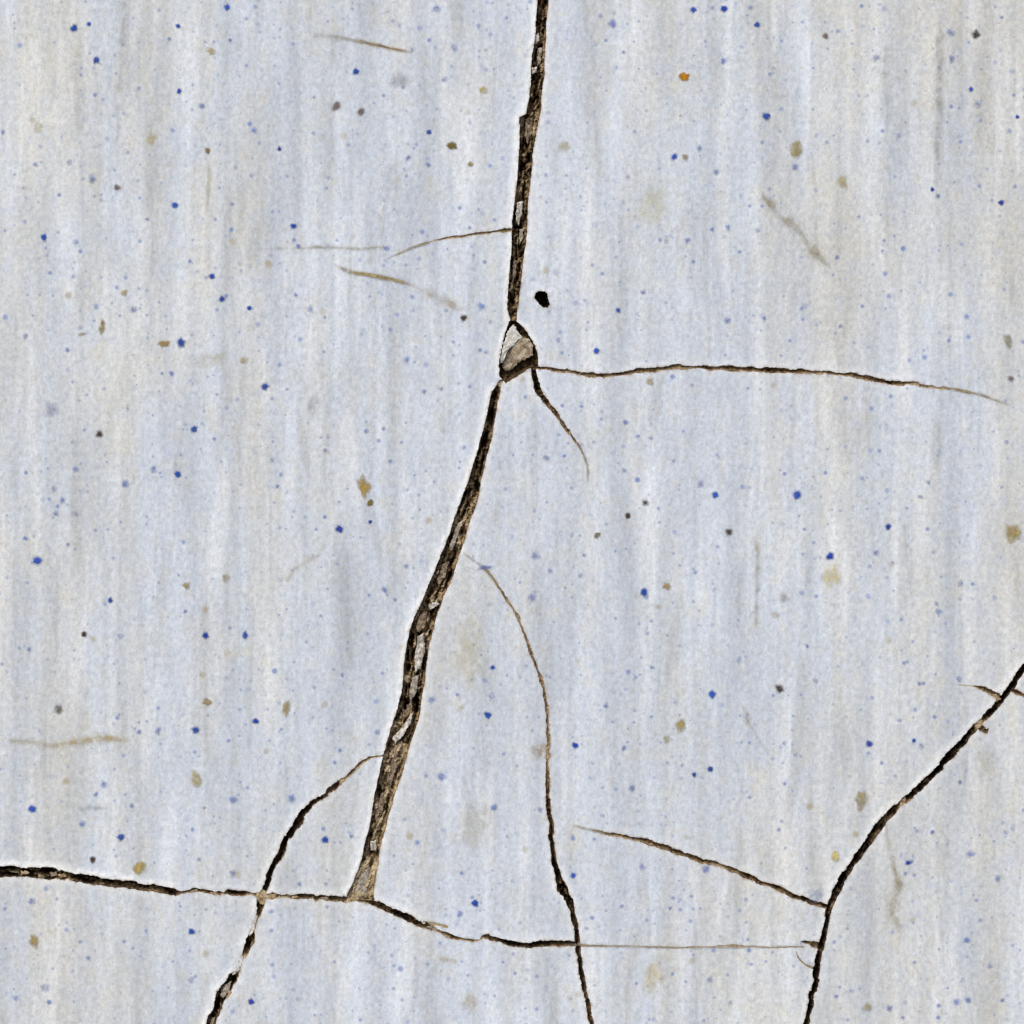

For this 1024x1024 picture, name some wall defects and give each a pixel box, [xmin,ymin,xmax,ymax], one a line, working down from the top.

crack [319,247,407,284]
crack [357,40,405,51]
crack [399,0,552,321]
crack [0,360,1024,1024]